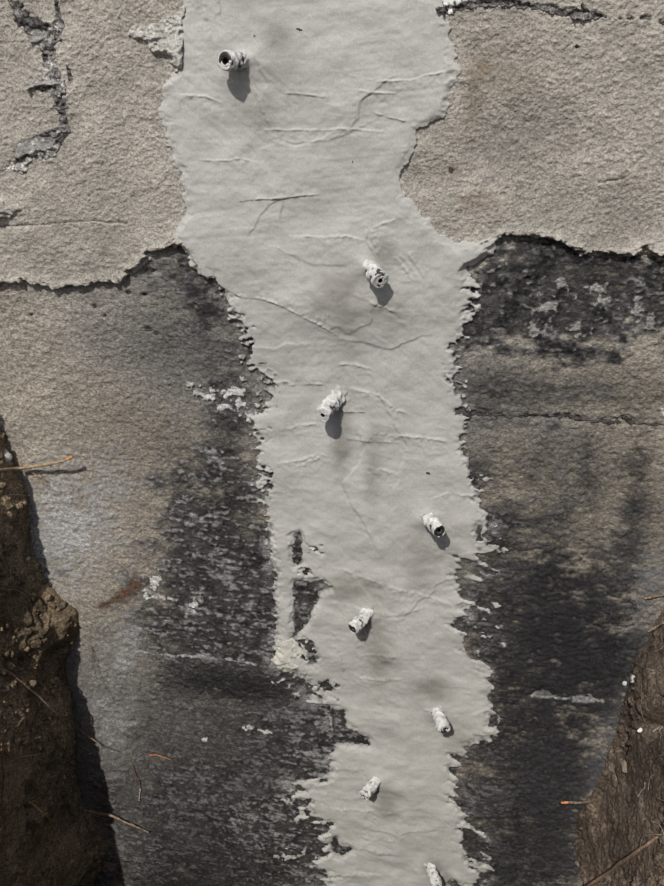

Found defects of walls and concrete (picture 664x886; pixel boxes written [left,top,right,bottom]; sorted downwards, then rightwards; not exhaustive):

crack [436,0,664,25]
spalling [485,228,664,356]
efflorescence [30,470,124,591]
damp [94,628,287,698]
damp [501,544,636,837]